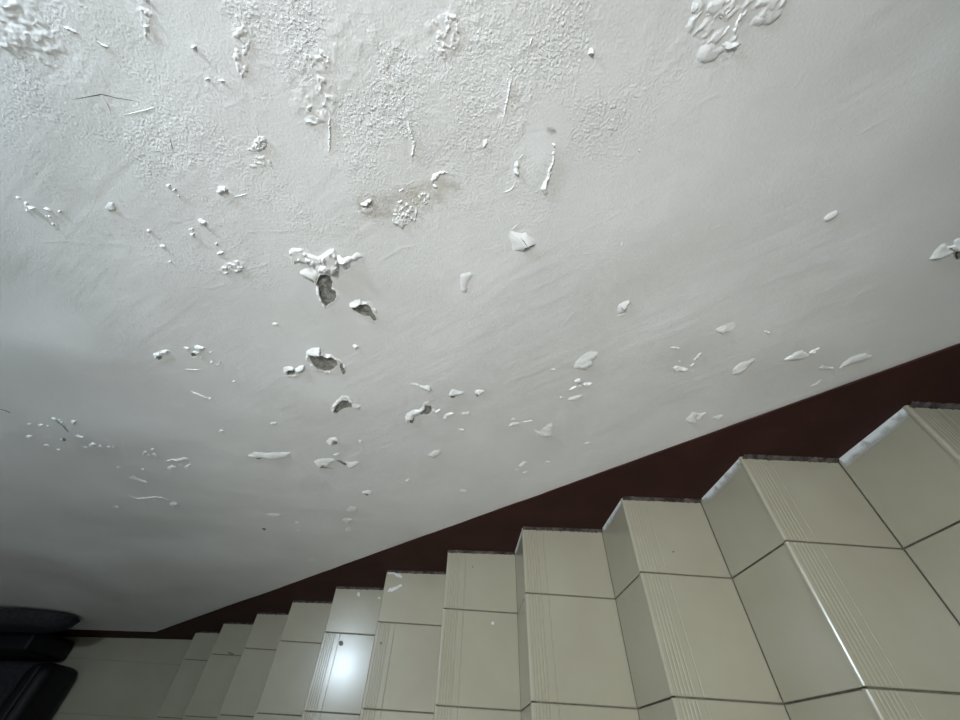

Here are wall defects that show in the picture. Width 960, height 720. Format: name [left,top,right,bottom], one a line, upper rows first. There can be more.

peeling [930,238,960,260]
flaking render [289,248,363,309]
flaking render [349,299,378,322]
flaking render [283,347,346,377]
peeling [569,351,599,390]
peeling [784,348,819,360]
flaking render [331,395,361,414]
peeling [405,382,441,423]
peeling [248,452,291,460]
peeling [314,437,360,469]